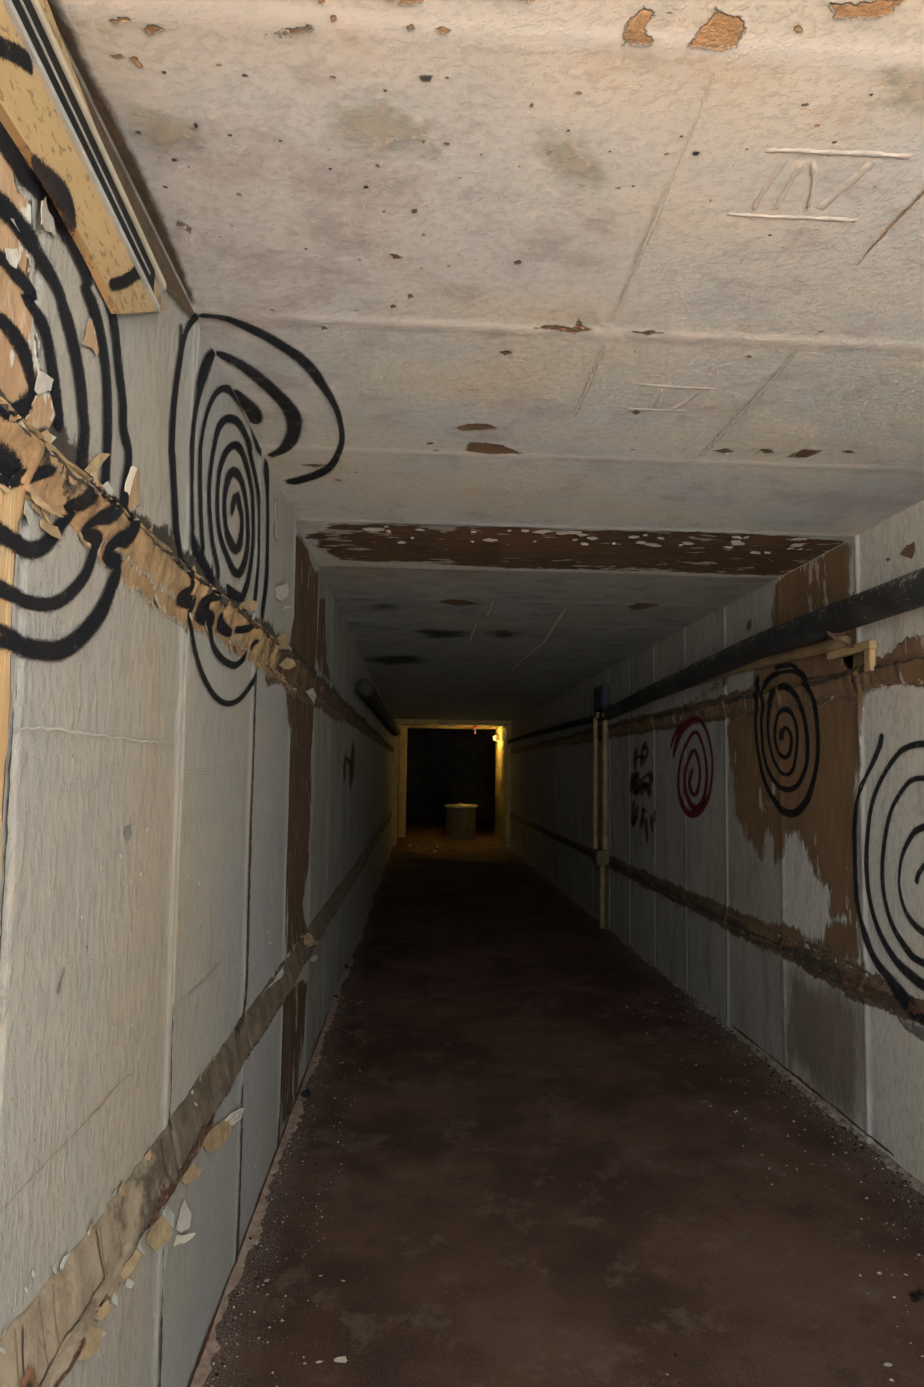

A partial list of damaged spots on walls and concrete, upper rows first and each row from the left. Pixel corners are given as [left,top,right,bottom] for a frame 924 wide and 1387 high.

peeling [622,6,673,47]
peeling [686,7,747,51]
peeling [828,0,905,21]
crack [857,190,924,265]
peeling [0,151,57,455]
peeling [82,317,100,356]
peeling [454,423,521,454]
peeling [85,453,153,533]
peeling [0,474,64,876]
peeling [257,523,855,1128]
peeling [727,628,924,1026]
peeling [77,1162,204,1361]